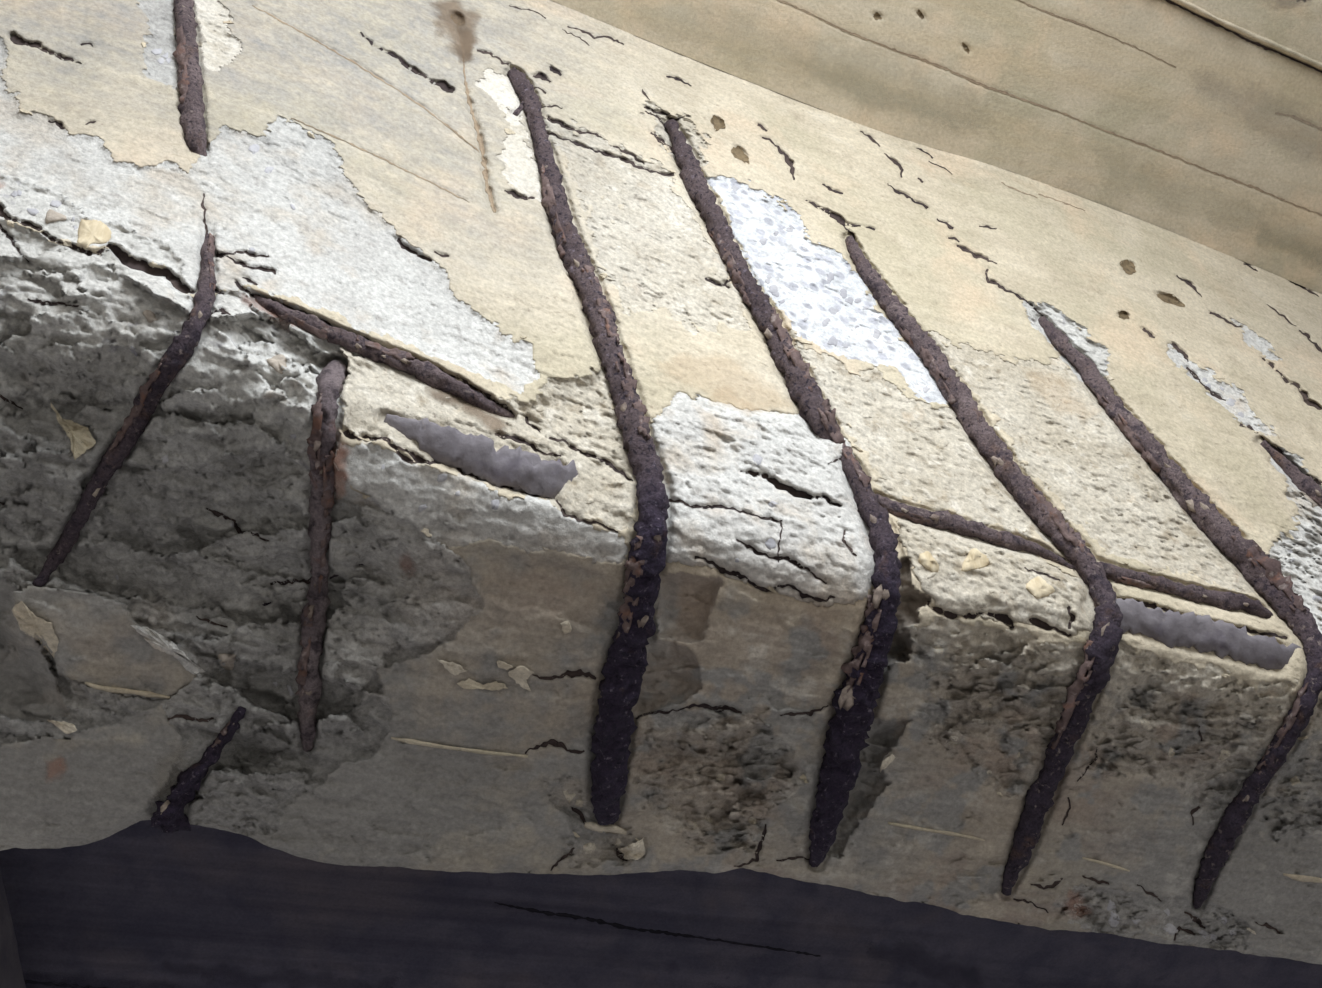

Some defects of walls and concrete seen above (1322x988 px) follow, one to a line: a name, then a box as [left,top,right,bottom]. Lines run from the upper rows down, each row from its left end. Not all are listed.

water stain [435,1,477,62]
crack [0,193,369,340]
spalling [0,36,638,836]
corrosion [432,391,504,433]
crack [415,358,633,481]
spalling [543,101,1055,546]
crack [860,131,1044,316]
spalling [928,301,1257,594]
crack [1142,328,1322,485]
spalling [1166,343,1322,634]
crack [927,558,1075,637]
spalling [826,556,1087,859]